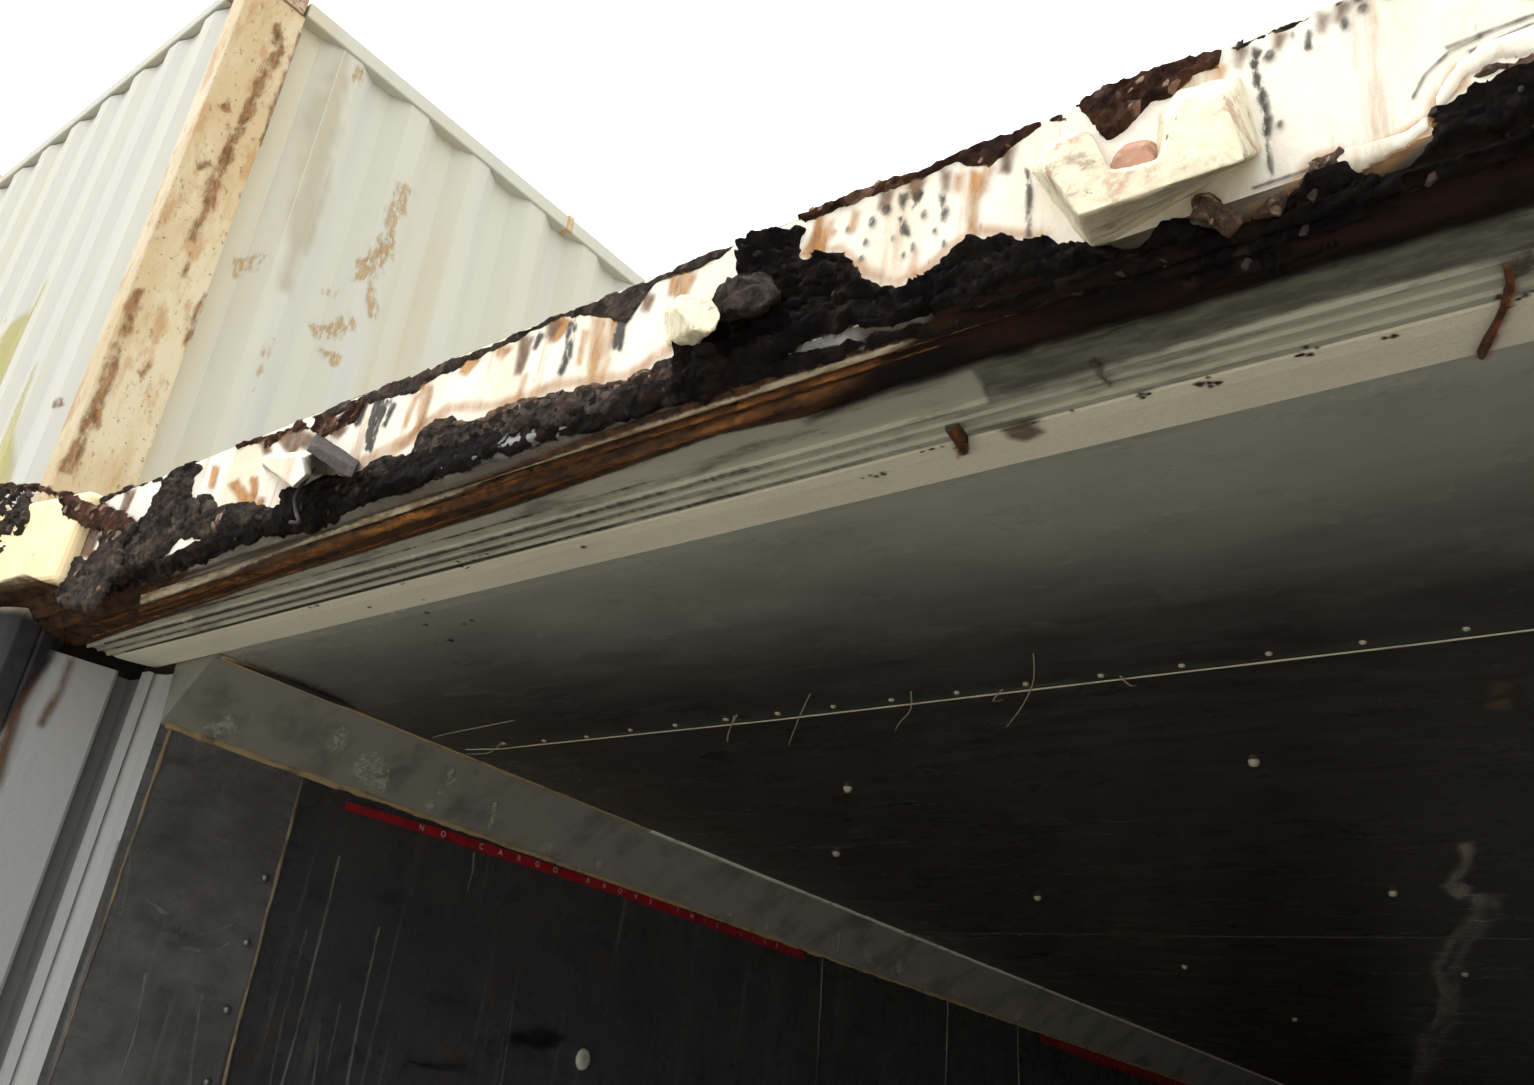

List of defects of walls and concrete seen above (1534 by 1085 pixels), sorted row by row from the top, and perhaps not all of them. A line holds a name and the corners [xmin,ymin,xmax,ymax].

corrosion [183,23,301,276]
corrosion [0,119,1534,777]
spalling [1194,376,1223,388]